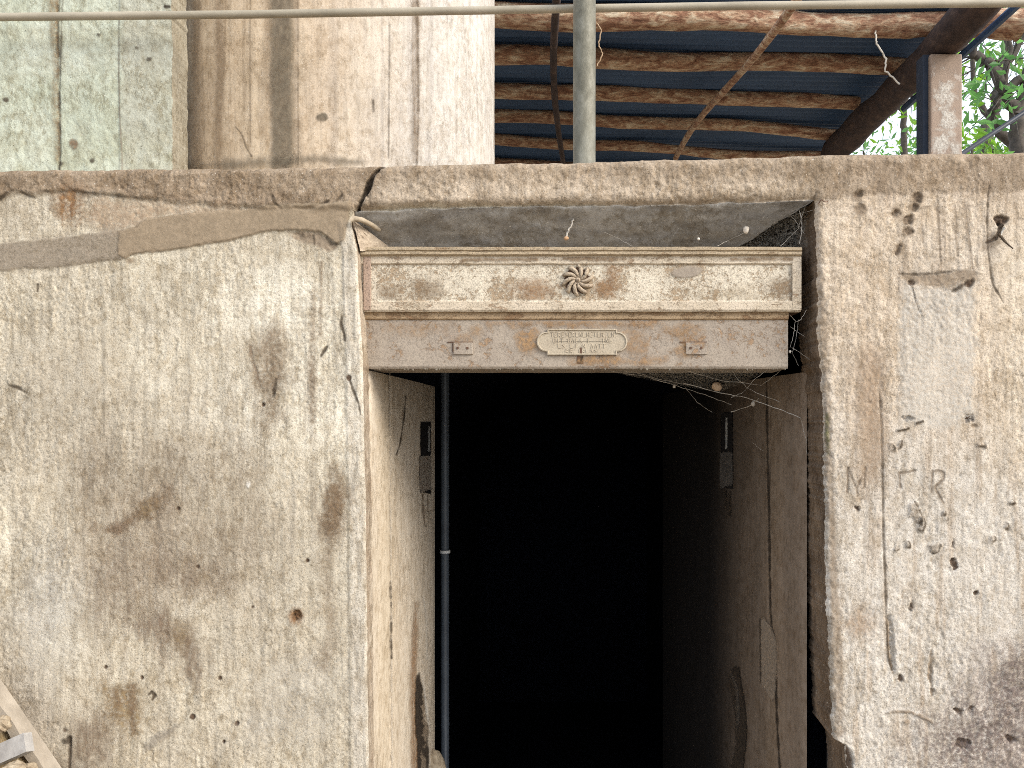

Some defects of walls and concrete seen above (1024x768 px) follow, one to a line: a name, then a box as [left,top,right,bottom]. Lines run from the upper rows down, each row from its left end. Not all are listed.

water stain [271,0,299,169]
crack [321,167,386,212]
corrosion [563,257,625,295]
water stain [322,484,344,535]